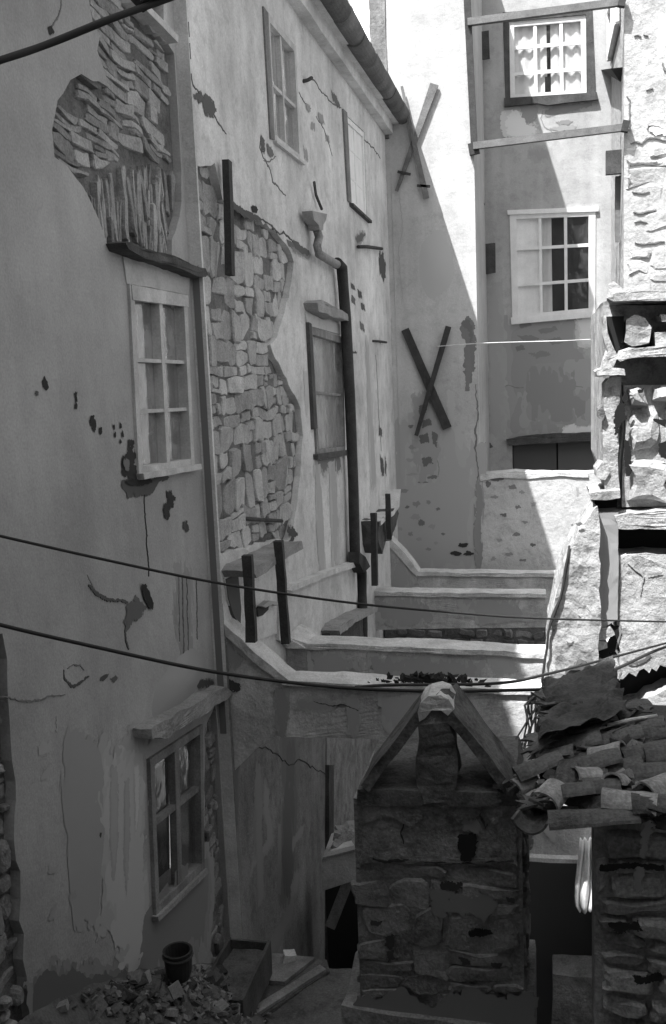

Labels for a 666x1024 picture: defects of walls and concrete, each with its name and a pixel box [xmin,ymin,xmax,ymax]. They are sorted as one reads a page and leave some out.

spalling [52,0,176,253]
spalling [193,90,217,118]
crack [259,136,286,196]
crack [299,79,342,154]
flaking render [626,124,666,233]
spalling [198,166,309,553]
spalling [121,439,176,520]
crack [472,384,480,480]
damp [374,282,591,629]
flaking render [626,384,666,503]
crack [143,494,151,576]
crack [0,664,89,703]